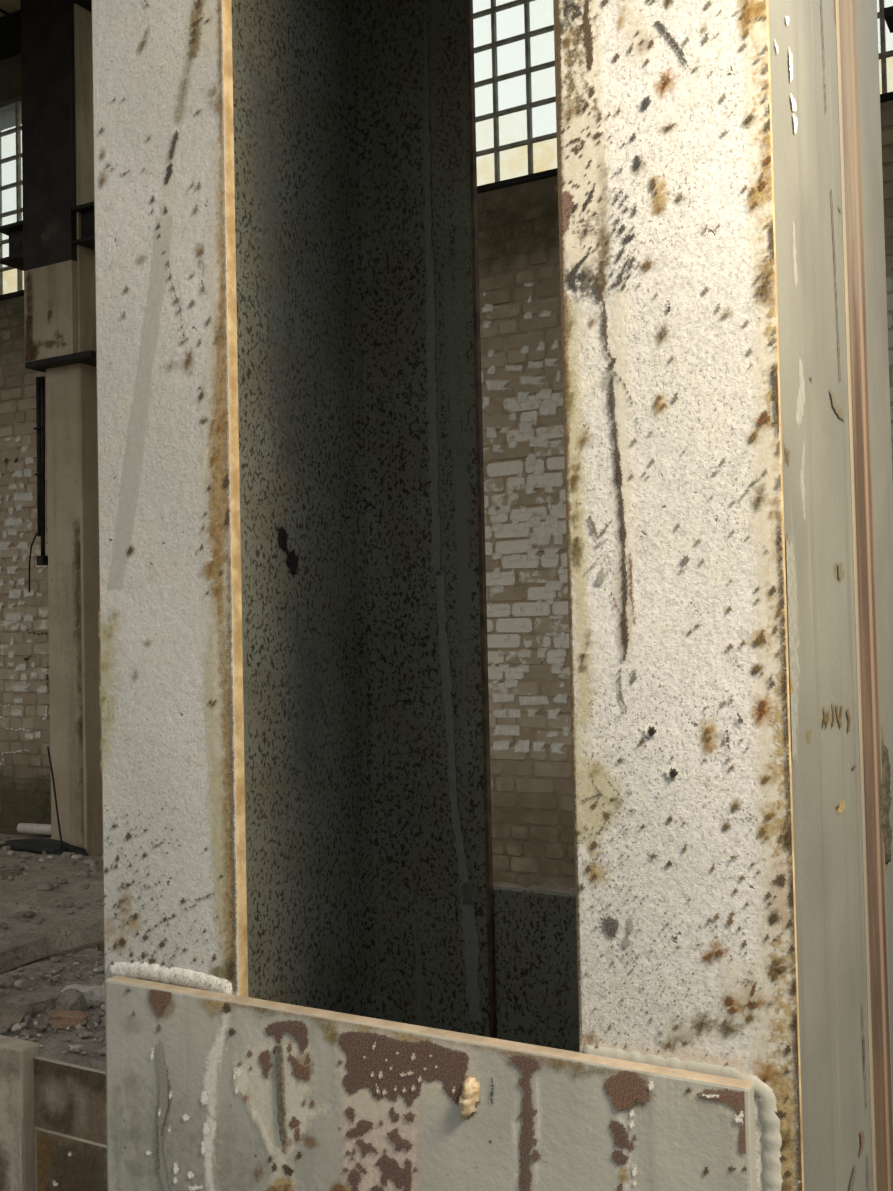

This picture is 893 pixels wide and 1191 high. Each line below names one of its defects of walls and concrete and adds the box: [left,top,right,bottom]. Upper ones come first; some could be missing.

corrosion [614,30,654,66]
corrosion [657,73,673,96]
corrosion [654,393,678,413]
corrosion [184,0,238,1016]
corrosion [553,0,646,1049]
crack [595,281,642,714]
corrosion [662,0,799,1191]
peeling [150,1041,173,1191]
corrosion [255,1156,294,1191]
peeling [237,1020,326,1191]
peeling [337,1030,470,1191]